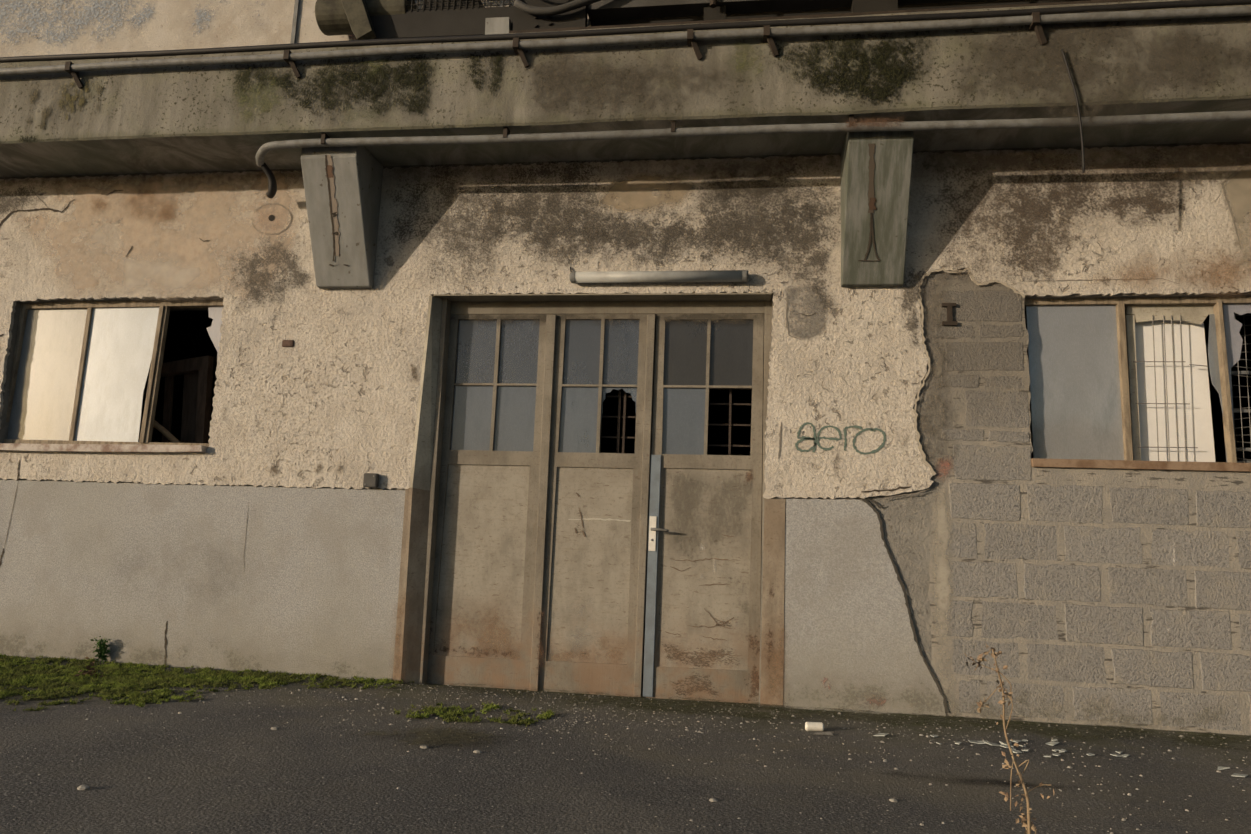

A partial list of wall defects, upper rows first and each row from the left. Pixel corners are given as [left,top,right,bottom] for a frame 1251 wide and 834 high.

crack [0,190,122,226]
leakage [232,241,309,308]
leakage [391,159,841,313]
leakage [901,268,925,344]
leakage [927,142,1251,285]
flaking render [856,267,1025,499]
spalling [1133,315,1208,462]
crack [0,460,20,566]
crack [862,498,949,713]